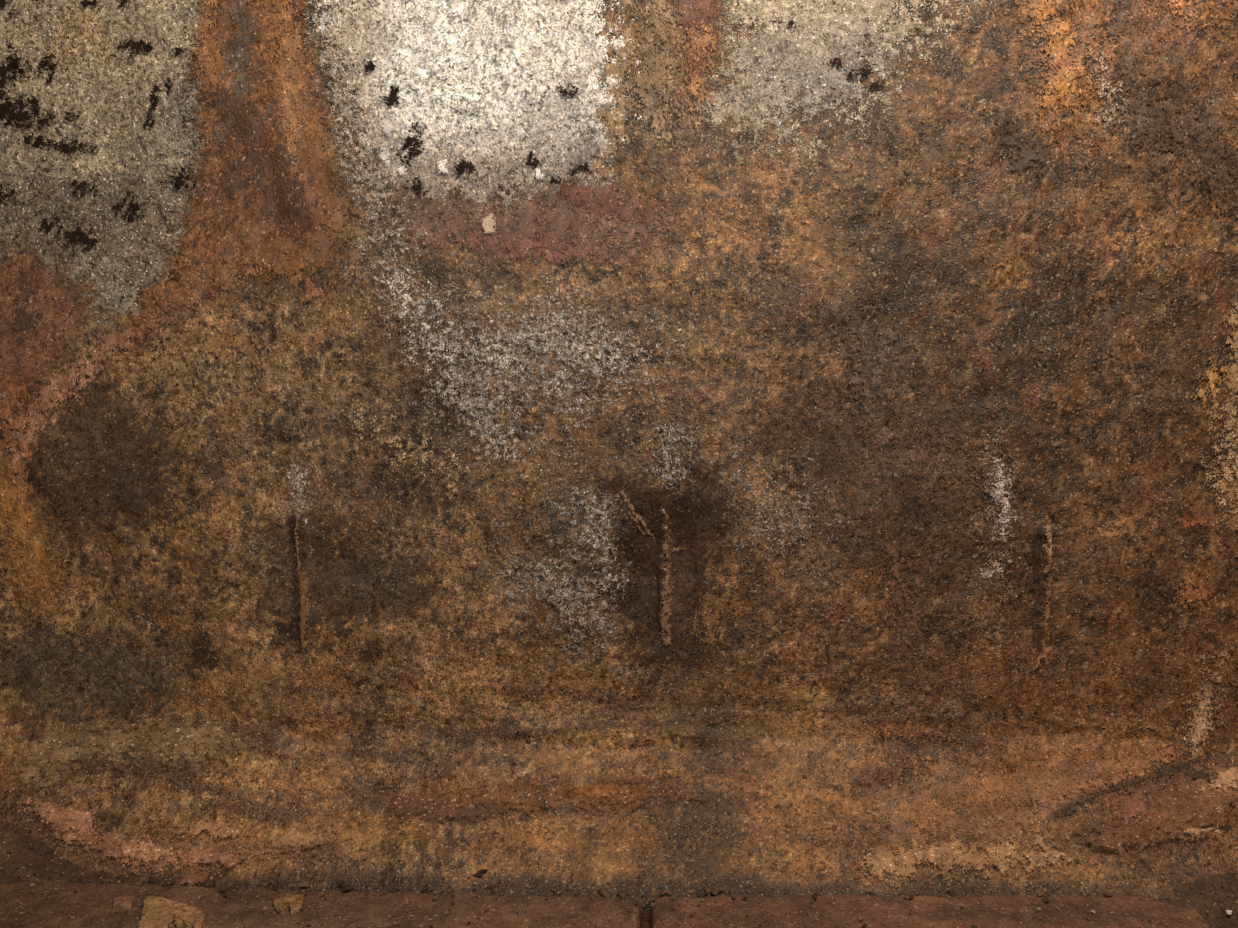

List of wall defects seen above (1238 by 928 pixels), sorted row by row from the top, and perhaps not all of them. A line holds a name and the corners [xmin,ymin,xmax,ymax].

leakage [122,310,290,394]
corrosion [0,0,730,644]
leakage [299,0,949,689]
leakage [277,455,318,524]
leakage [964,423,1033,656]
corrosion [1172,571,1218,619]
corrosion [1174,432,1238,532]
corrosion [835,687,1227,885]